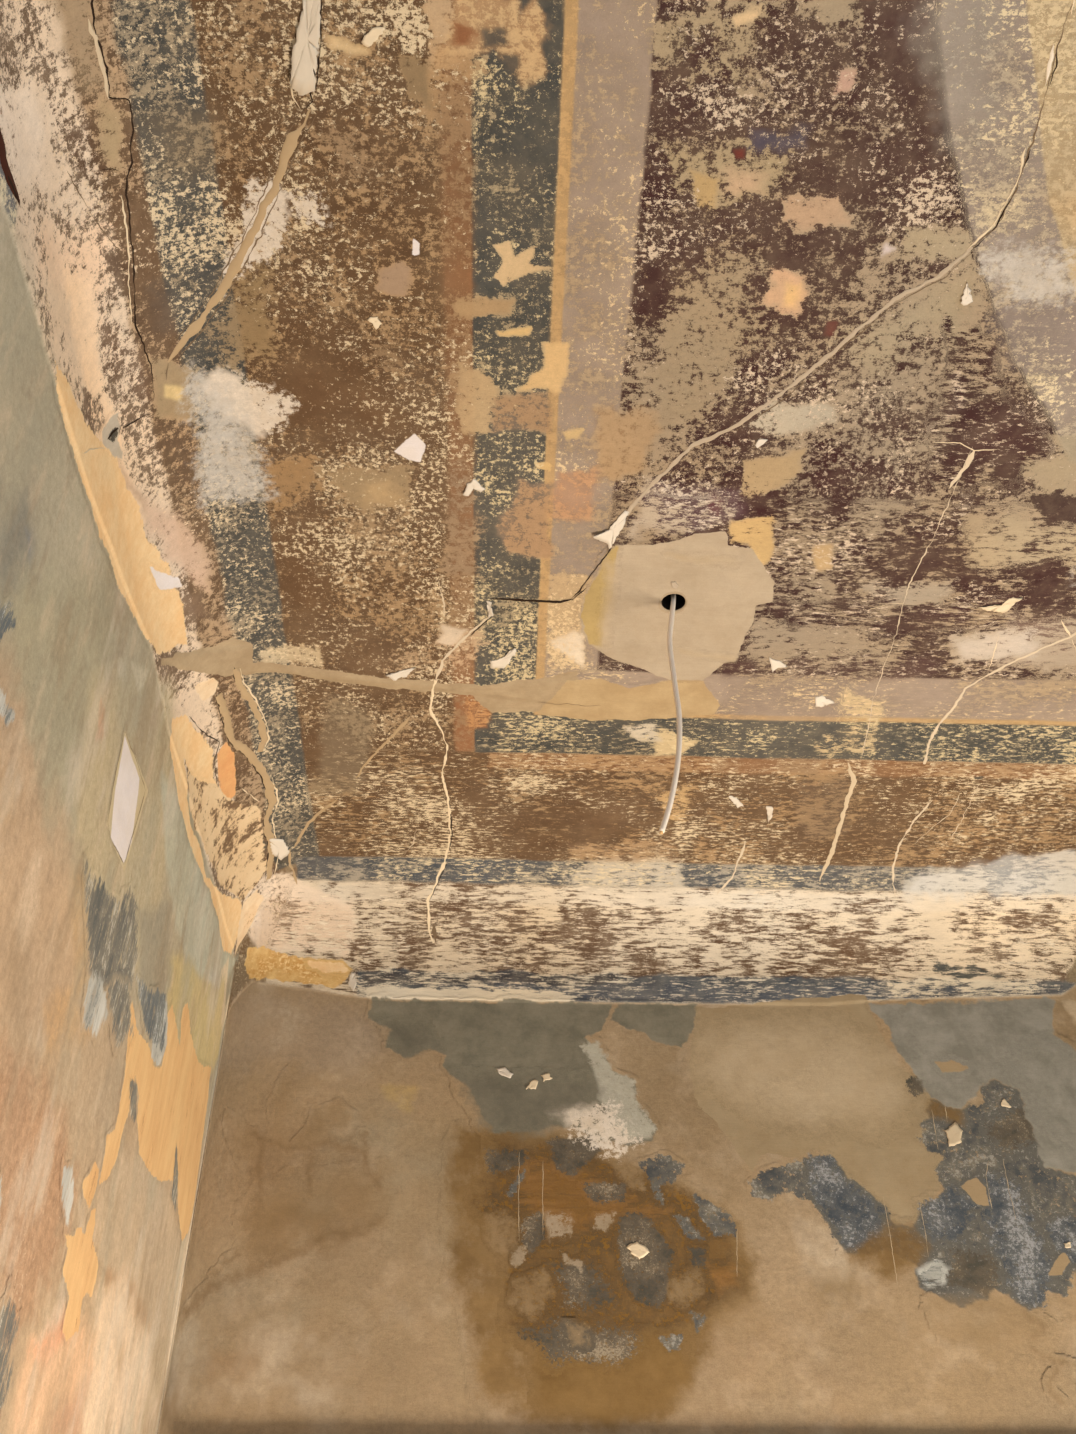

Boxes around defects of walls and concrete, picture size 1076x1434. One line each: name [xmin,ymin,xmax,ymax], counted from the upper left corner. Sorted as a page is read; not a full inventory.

crack [0,130,20,204]
crack [67,0,322,428]
flaking render [52,353,192,661]
crack [189,0,1076,943]
spalling [662,594,685,610]
peeling [61,999,212,1347]
water stain [363,992,777,1434]
peeling [744,1074,1076,1314]